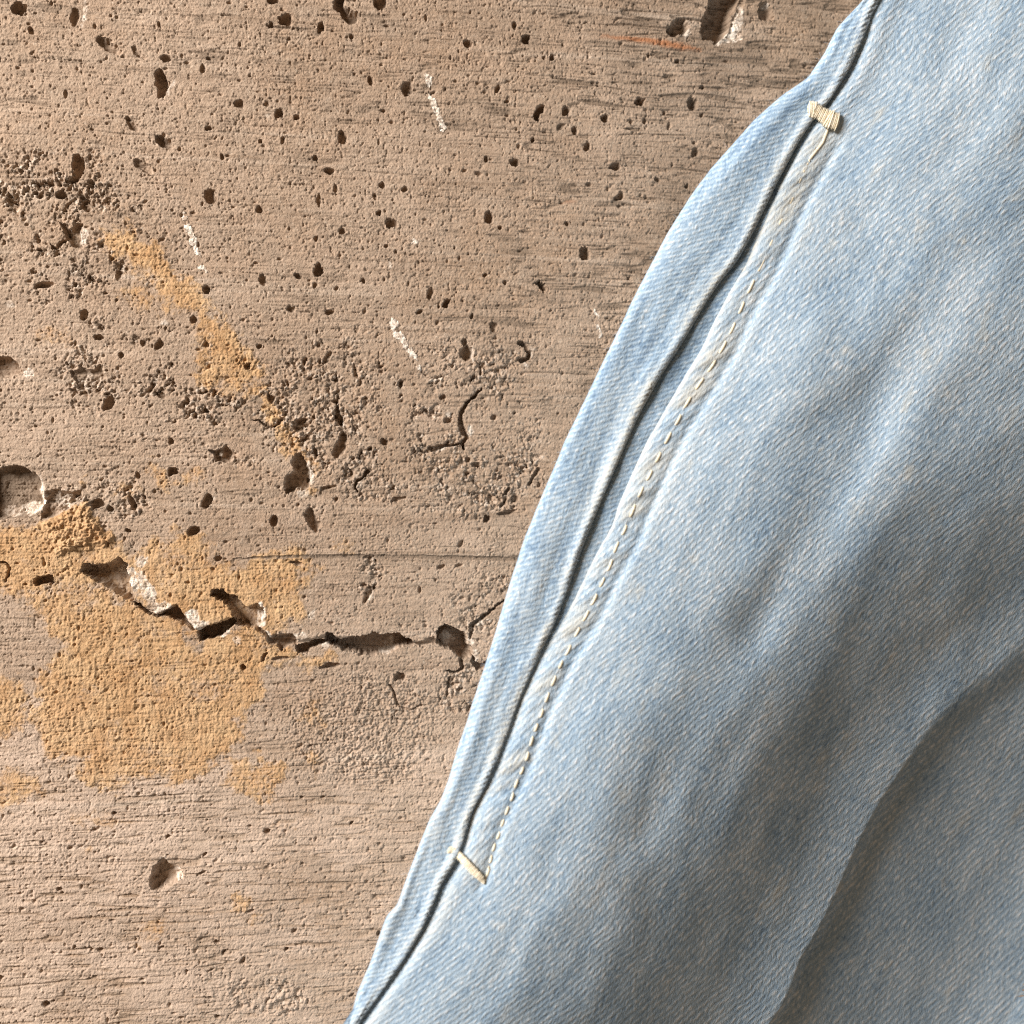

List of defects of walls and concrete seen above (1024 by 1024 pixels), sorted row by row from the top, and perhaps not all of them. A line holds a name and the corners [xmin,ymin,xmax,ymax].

crack [427,387,483,453]
crack [79,557,505,711]